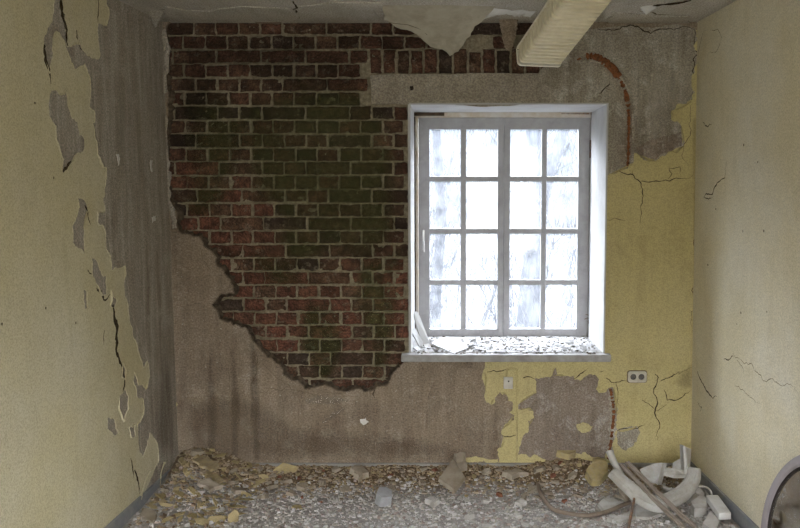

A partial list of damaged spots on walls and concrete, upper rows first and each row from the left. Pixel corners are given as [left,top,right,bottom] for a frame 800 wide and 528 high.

crack [598,0,722,220]
flaking render [44,0,697,500]
crack [88,270,125,391]
crack [617,367,717,440]
crack [725,356,800,404]